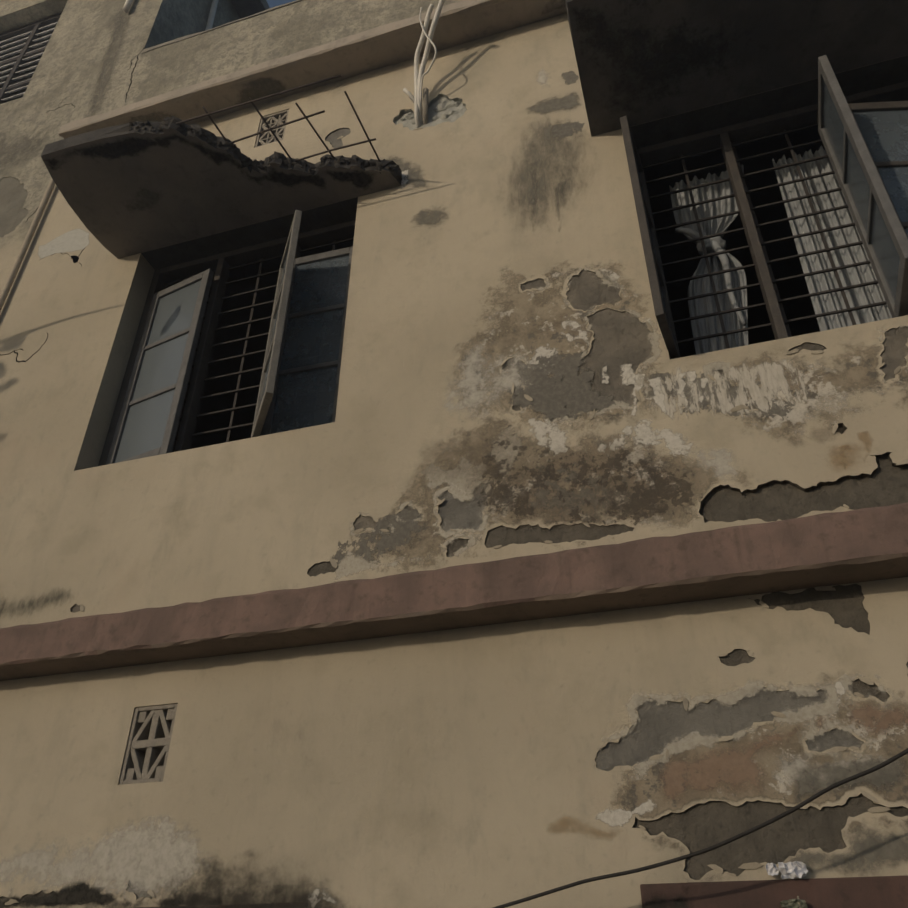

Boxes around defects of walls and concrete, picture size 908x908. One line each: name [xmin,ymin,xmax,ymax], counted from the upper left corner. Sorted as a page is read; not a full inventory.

crack [125,48,144,102]
spalling [128,74,401,174]
spalling [393,94,467,131]
water stain [529,71,580,113]
water stain [512,122,584,217]
peeling [0,176,28,237]
crack [0,332,48,363]
peeling [307,264,908,577]
peeling [749,584,870,635]
peeling [719,649,755,666]
peeling [595,674,908,880]
water stain [0,817,330,908]